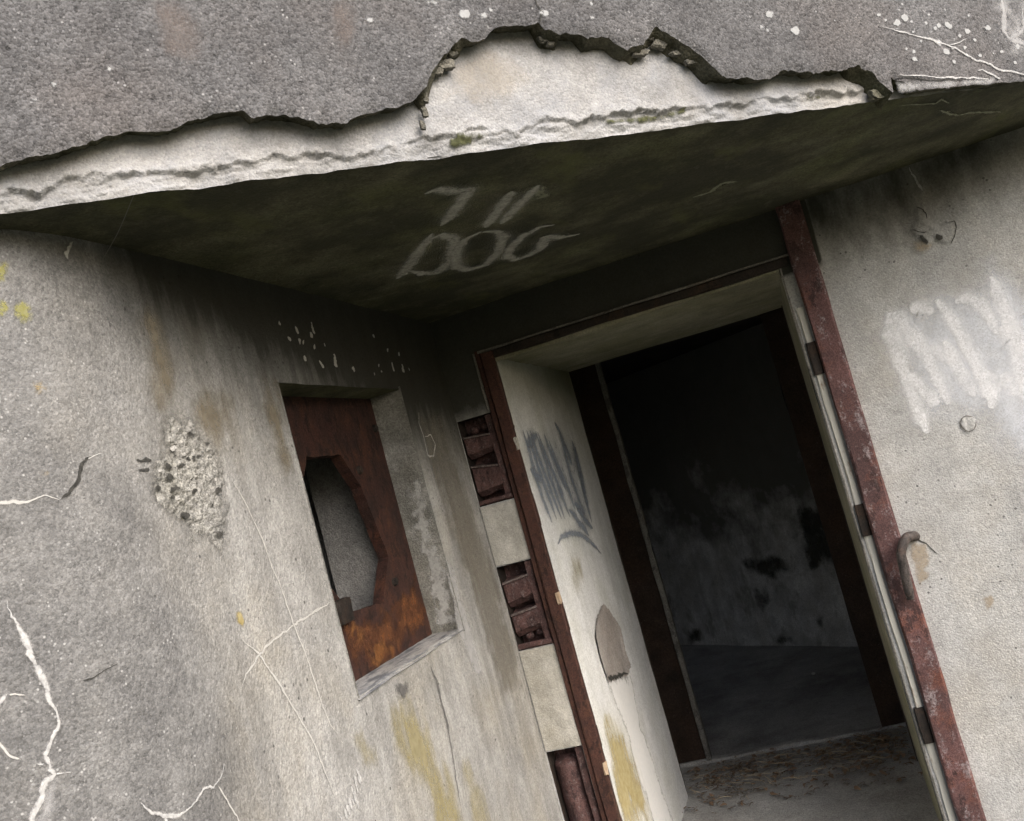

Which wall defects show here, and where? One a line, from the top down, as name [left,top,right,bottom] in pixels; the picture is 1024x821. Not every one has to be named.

crack [880,24,1024,81]
spalling [0,22,1024,214]
crack [0,453,101,504]
spalling [137,414,229,555]
rust [343,591,426,663]
spalling [596,604,631,682]
crack [7,600,71,821]
crack [141,767,239,821]